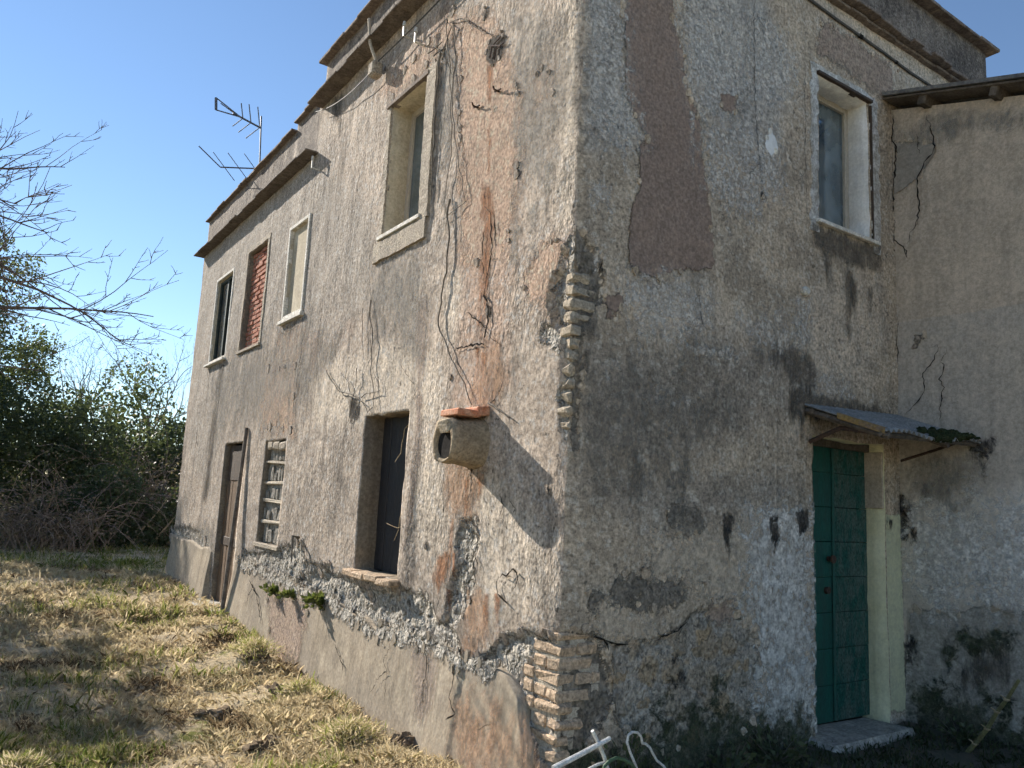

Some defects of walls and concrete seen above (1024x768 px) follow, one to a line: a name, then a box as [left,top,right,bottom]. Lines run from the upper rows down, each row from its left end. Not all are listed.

flaking render [619,0,715,283]
crack [891,115,936,257]
leakage [813,225,881,337]
flaking render [520,225,624,453]
crack [896,317,947,418]
leakage [769,515,780,553]
leakage [796,509,809,536]
flaking render [236,497,817,768]
crack [594,634,628,650]